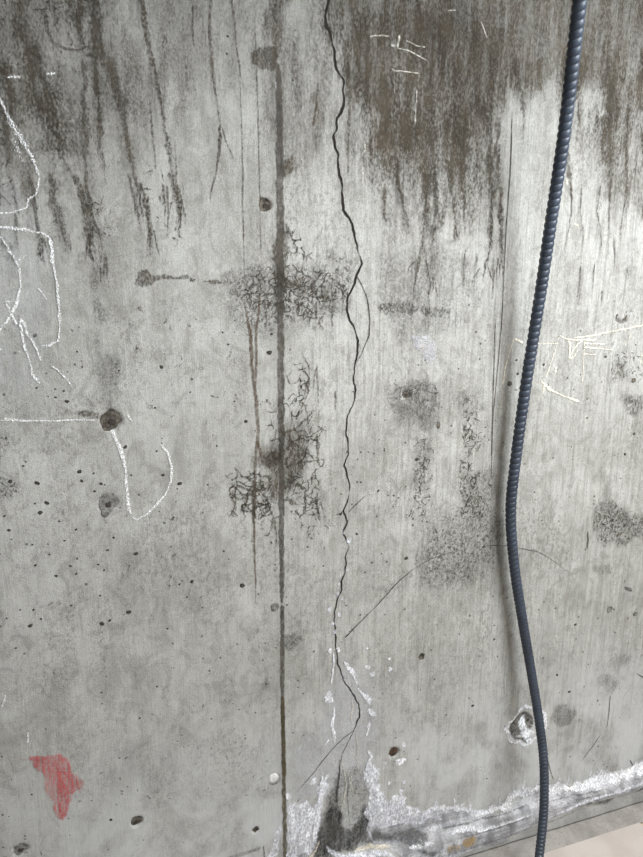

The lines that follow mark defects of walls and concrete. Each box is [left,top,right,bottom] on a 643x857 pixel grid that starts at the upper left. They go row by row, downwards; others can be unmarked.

damp [0,63,22,165]
damp [5,0,186,283]
damp [216,111,244,202]
damp [323,0,573,296]
damp [576,0,643,247]
damp [226,225,350,332]
mould [225,358,327,544]
crack [301,0,454,800]
spalling [504,705,547,746]